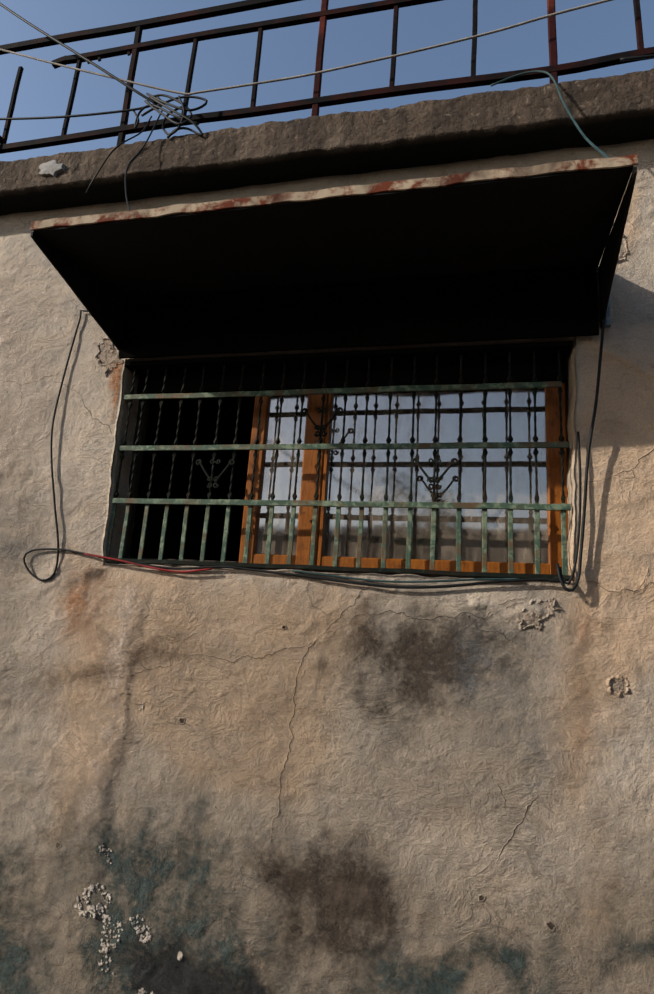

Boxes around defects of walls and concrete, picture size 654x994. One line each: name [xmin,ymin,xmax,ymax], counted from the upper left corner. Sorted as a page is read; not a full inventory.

spalling [618,234,630,263]
crack [589,448,654,483]
crack [586,567,654,594]
crack [49,580,527,843]
damp [77,818,270,994]
damp [0,927,38,994]
damp [360,937,530,994]